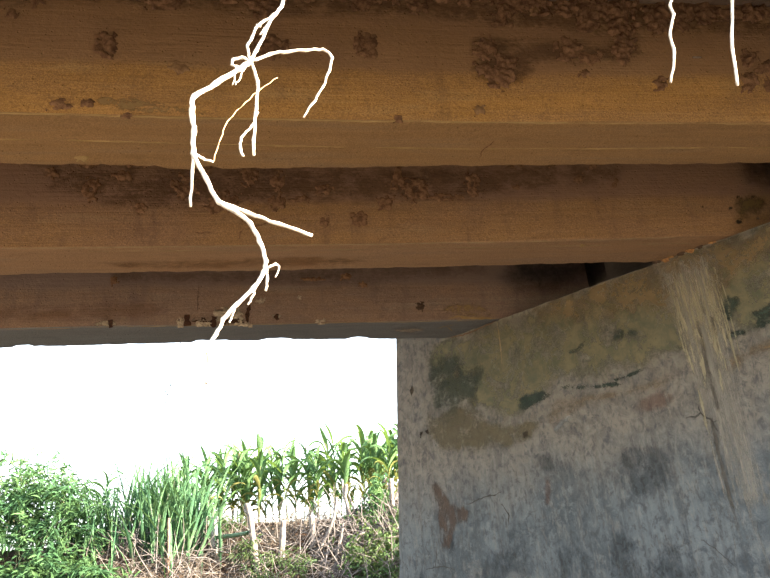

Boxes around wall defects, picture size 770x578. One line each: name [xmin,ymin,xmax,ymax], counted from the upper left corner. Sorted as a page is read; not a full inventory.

damp [510,262,605,288]
spalling [176,305,252,328]
damp [429,407,538,450]
rust [432,483,468,548]